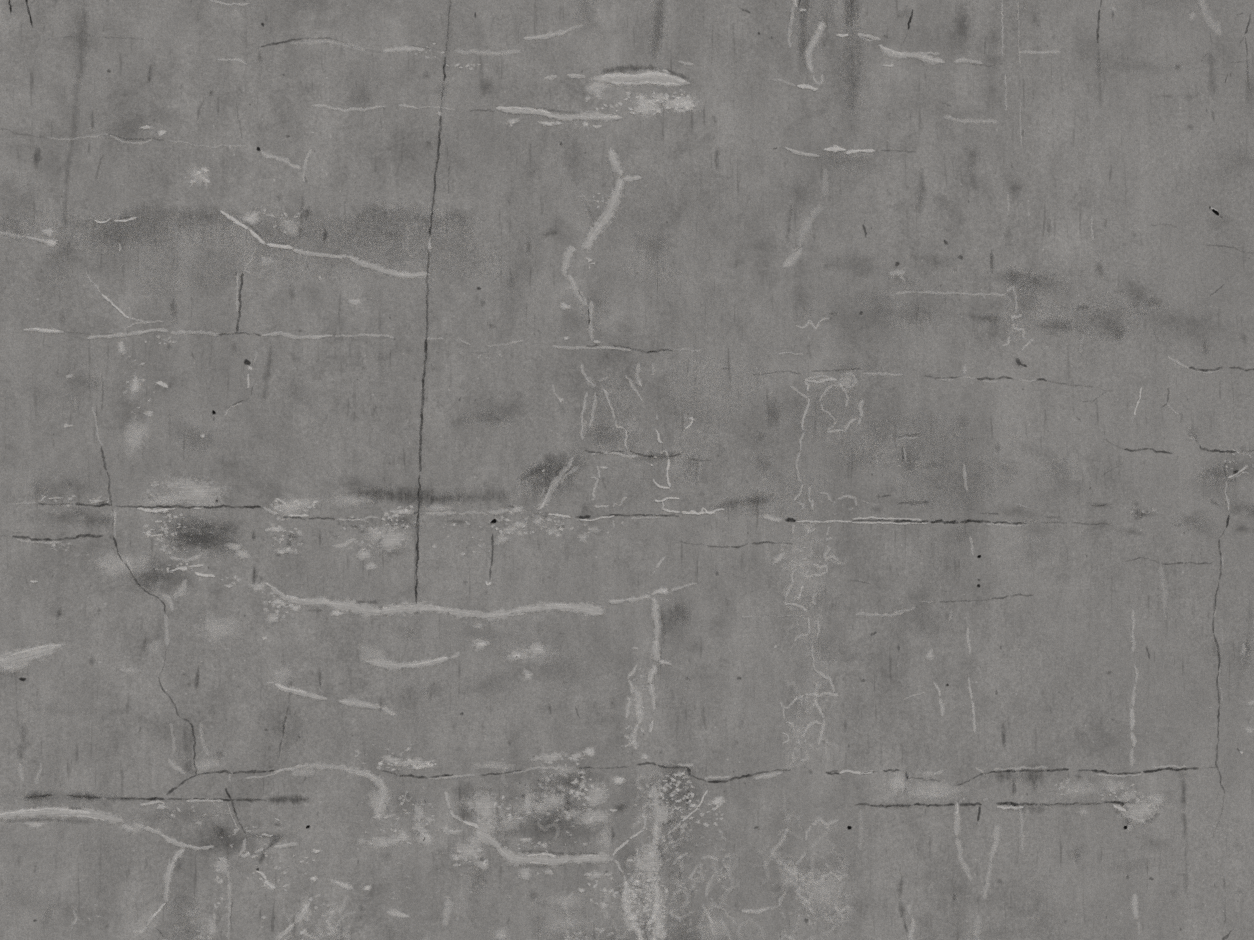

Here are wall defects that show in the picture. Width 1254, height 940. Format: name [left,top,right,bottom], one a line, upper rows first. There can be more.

crack [384,47,446,78]
crack [400,105,441,233]
crack [419,338,427,425]
crack [16,503,120,556]
crack [138,504,260,512]
crack [549,509,724,521]
crack [765,516,796,543]
crack [894,517,1026,525]
crack [639,762,781,783]
crack [991,766,1195,774]
crack [826,769,1029,821]